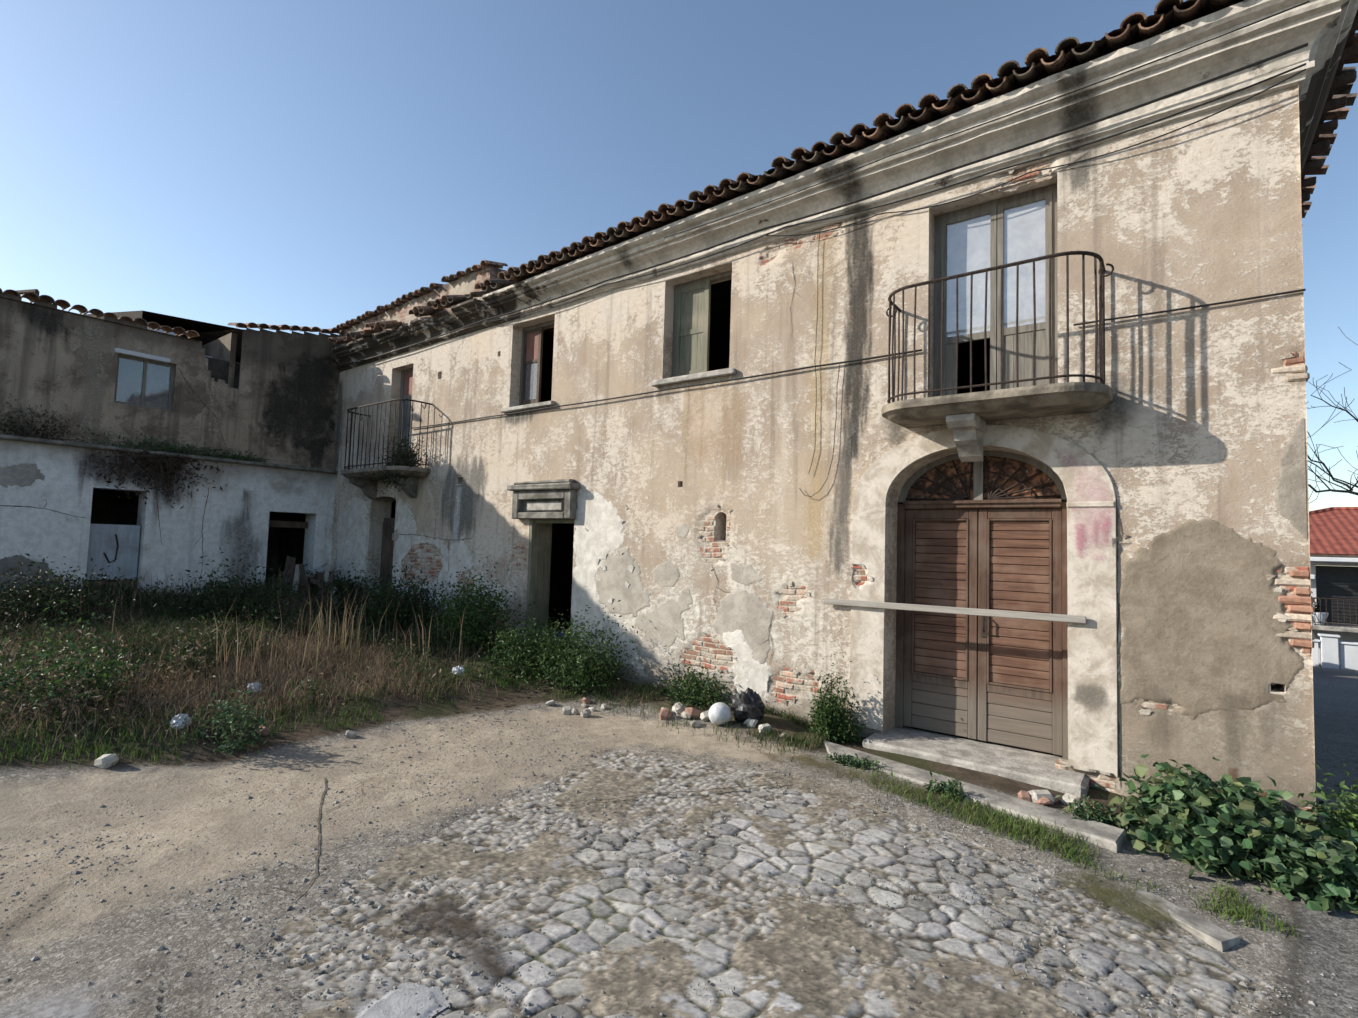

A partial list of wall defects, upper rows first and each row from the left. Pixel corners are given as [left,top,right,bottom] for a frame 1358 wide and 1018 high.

leakage [821,162,873,572]
flaking render [1271,352,1310,382]
leakage [263,356,343,470]
peeling [392,499,511,628]
leakage [441,459,484,540]
peeling [571,488,644,675]
flaking render [696,504,732,571]
flaking render [773,581,810,618]
flaking render [1266,566,1315,658]
peeling [679,630,819,706]
flaking render [1137,702,1168,715]